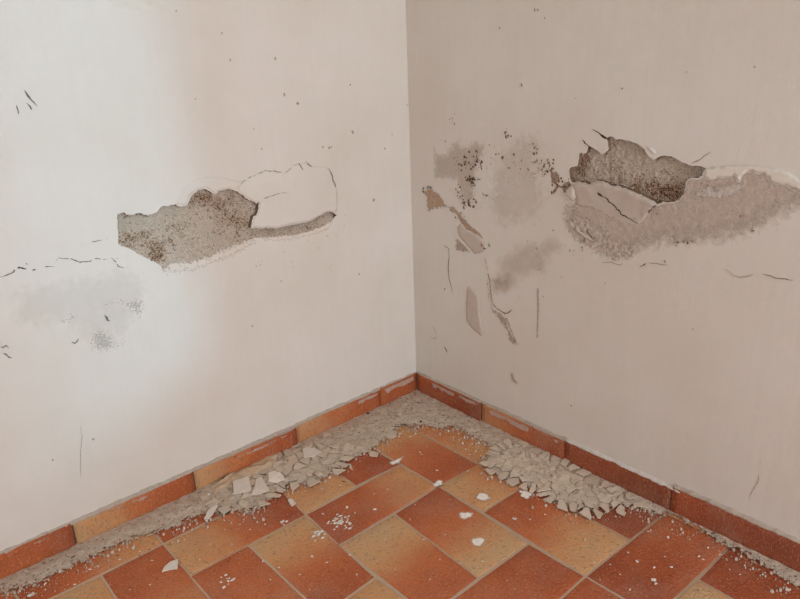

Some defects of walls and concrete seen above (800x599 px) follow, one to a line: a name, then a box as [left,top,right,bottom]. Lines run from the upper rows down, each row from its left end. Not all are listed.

crack [2,238,123,277]
flaking render [117,177,334,273]
flaking render [422,137,800,339]
peeling [251,477,270,496]